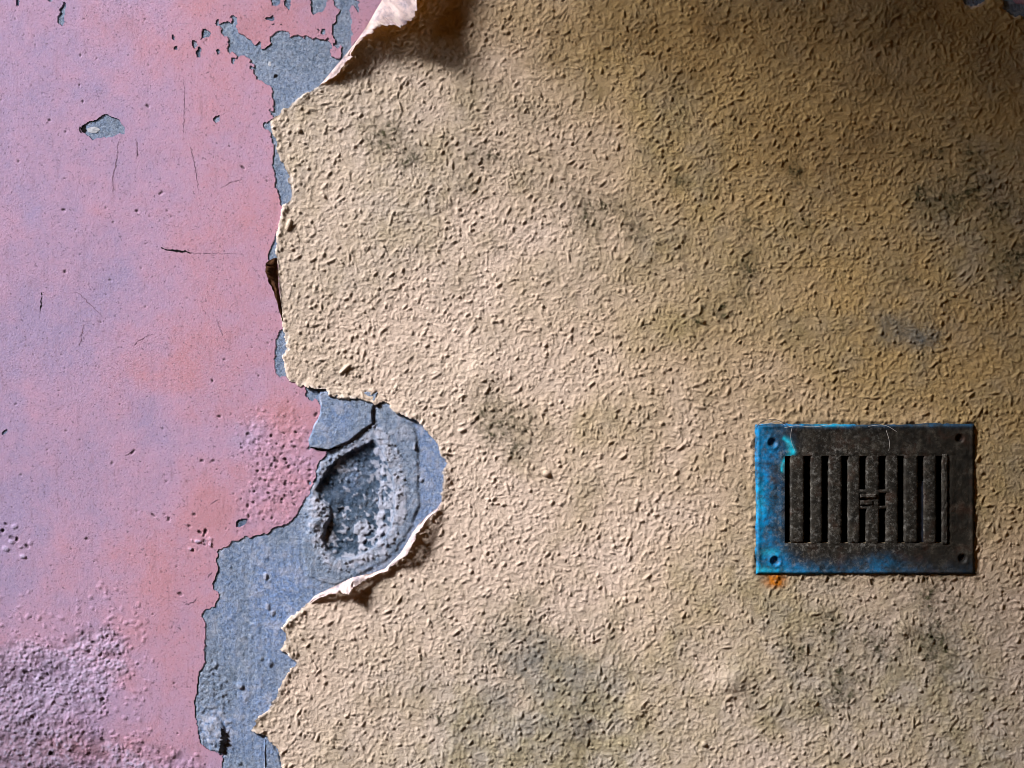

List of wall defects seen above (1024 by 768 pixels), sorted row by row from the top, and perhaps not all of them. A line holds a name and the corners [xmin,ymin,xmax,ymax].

peeling [84,114,125,140]
peeling [192,0,438,206]
crack [161,246,236,254]
peeling [265,230,287,377]
peeling [194,386,447,768]